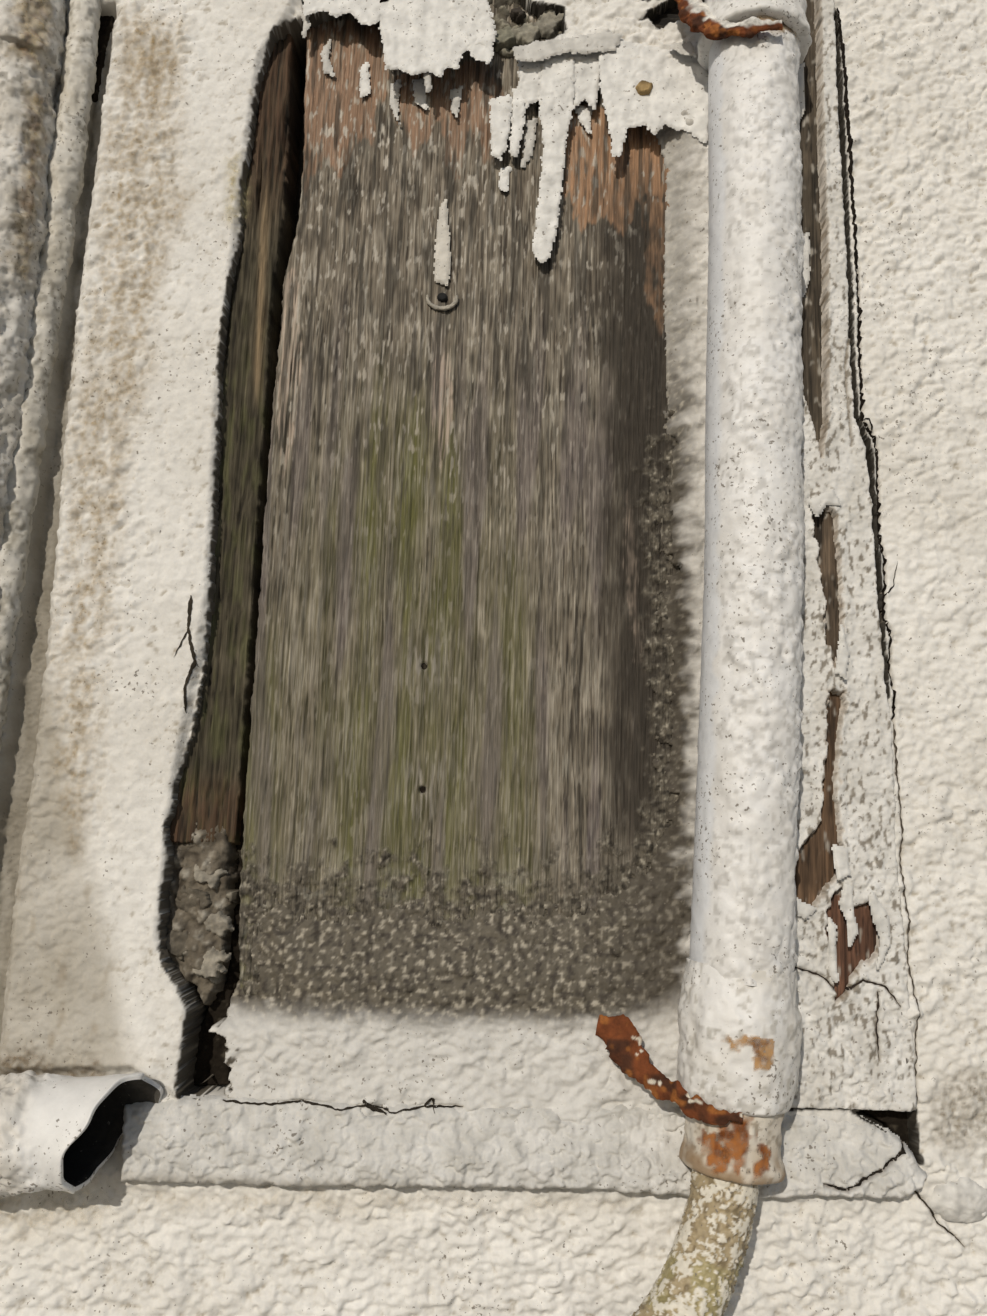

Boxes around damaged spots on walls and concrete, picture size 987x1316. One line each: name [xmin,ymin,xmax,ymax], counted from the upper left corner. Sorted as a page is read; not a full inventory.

peeling [301,0,708,263]
peeling [808,489,850,680]
crack [795,8,920,1191]
spalling [166,823,239,1005]
crack [193,819,463,1115]
rust [702,1120,771,1175]
rust [729,1036,775,1069]
peeling [795,691,891,1000]
crack [914,1191,962,1244]